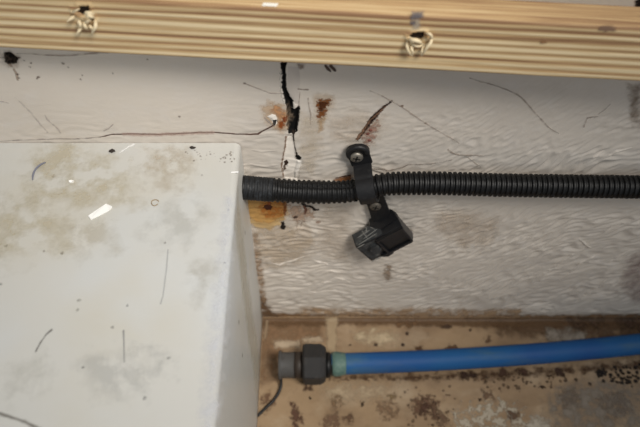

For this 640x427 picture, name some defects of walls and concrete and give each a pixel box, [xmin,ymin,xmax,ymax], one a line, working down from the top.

crack [77,62,311,176]
rust [262,104,287,131]
rust [316,98,331,119]
crack [359,97,477,158]
leakage [253,228,640,380]
leakage [290,402,303,427]
leakage [323,395,353,427]
leakage [404,360,640,427]